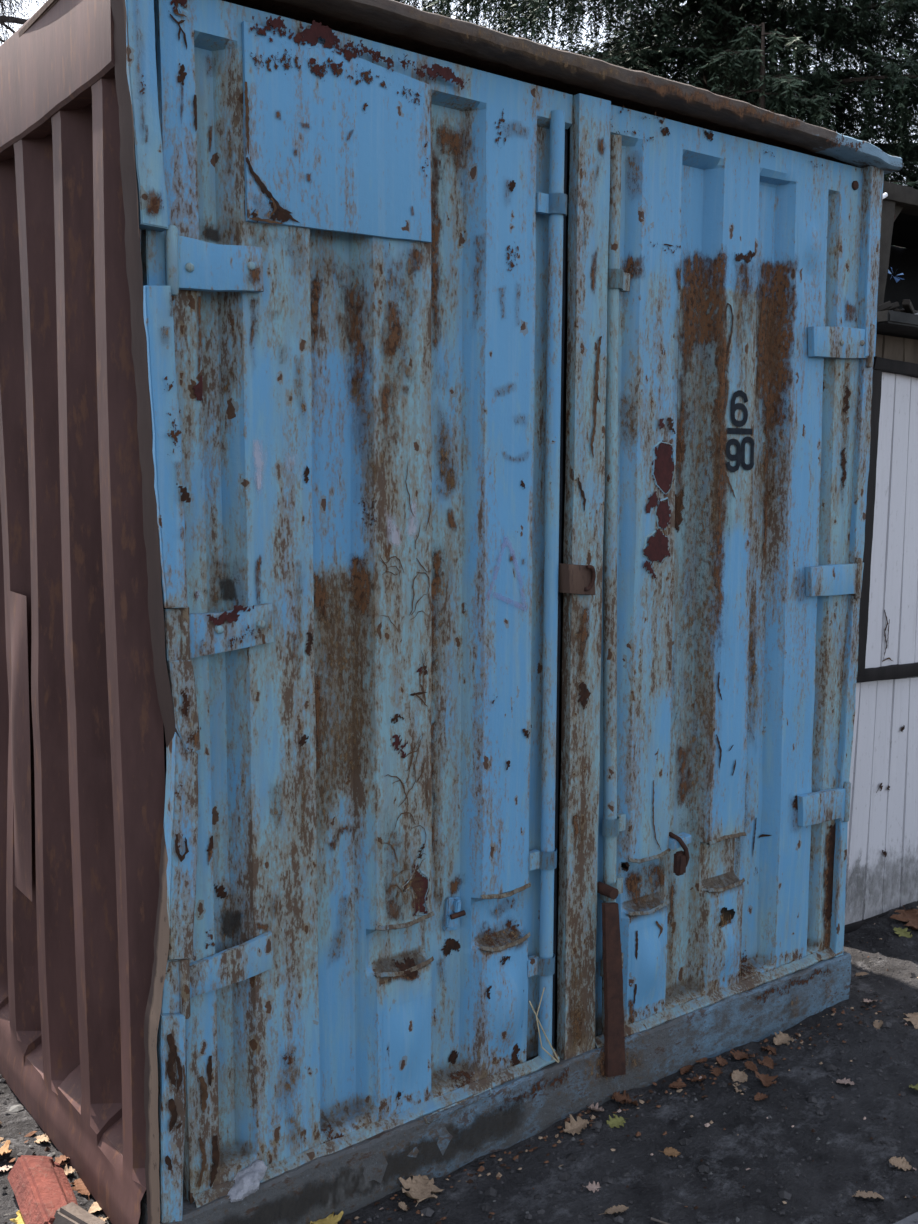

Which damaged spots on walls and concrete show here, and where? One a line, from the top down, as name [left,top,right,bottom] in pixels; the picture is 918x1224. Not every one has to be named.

peeling [250,16,470,94]
corrosion [177,63,212,152]
corrosion [310,125,471,530]
peeling [642,417,676,579]
corrosion [674,250,797,834]
corrosion [293,557,377,833]
corrosion [574,608,591,710]
corrosion [214,880,241,939]
corrosion [389,957,419,982]
corrosion [440,938,460,980]
corrosion [621,862,676,972]
corrosion [512,1043,520,1066]